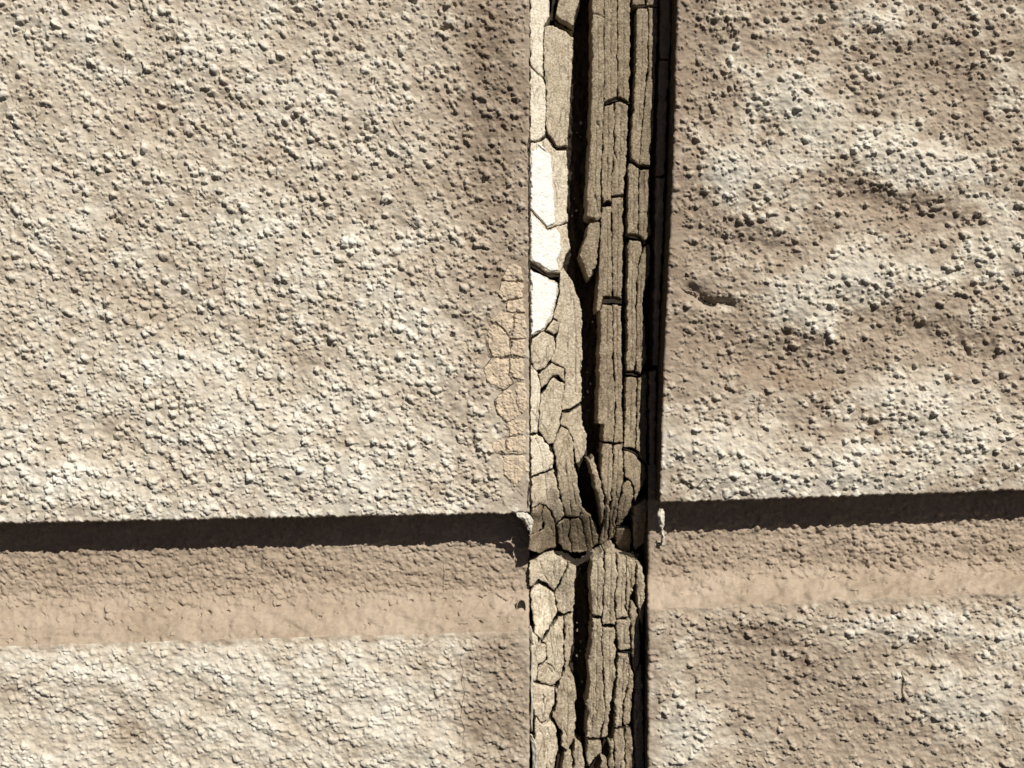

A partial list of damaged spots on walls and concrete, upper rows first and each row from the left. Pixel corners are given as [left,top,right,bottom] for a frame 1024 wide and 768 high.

crack [481,0,651,768]